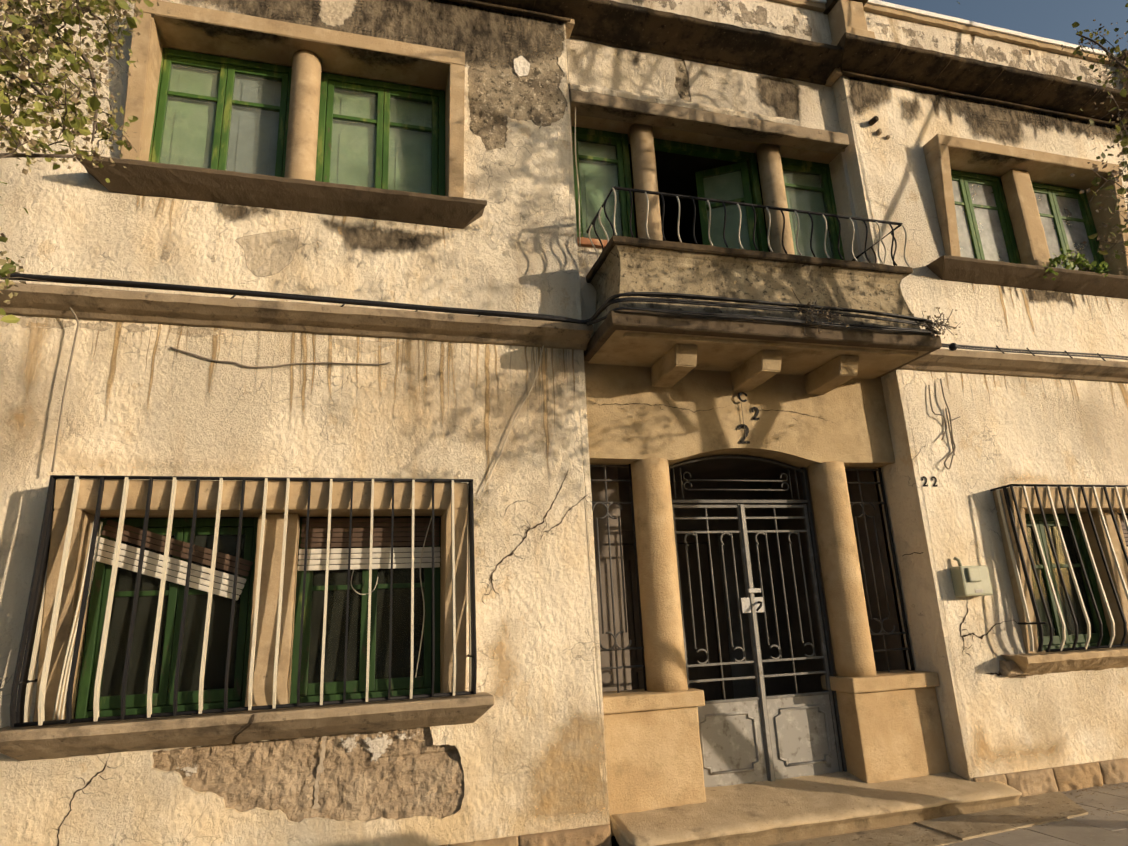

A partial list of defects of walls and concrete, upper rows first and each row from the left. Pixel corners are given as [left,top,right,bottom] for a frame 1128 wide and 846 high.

flaking render [467,31,574,165]
flaking render [674,60,691,102]
damp [217,203,270,221]
damp [323,220,441,253]
crack [482,468,596,605]
crack [53,755,118,846]
flaking render [152,727,464,823]